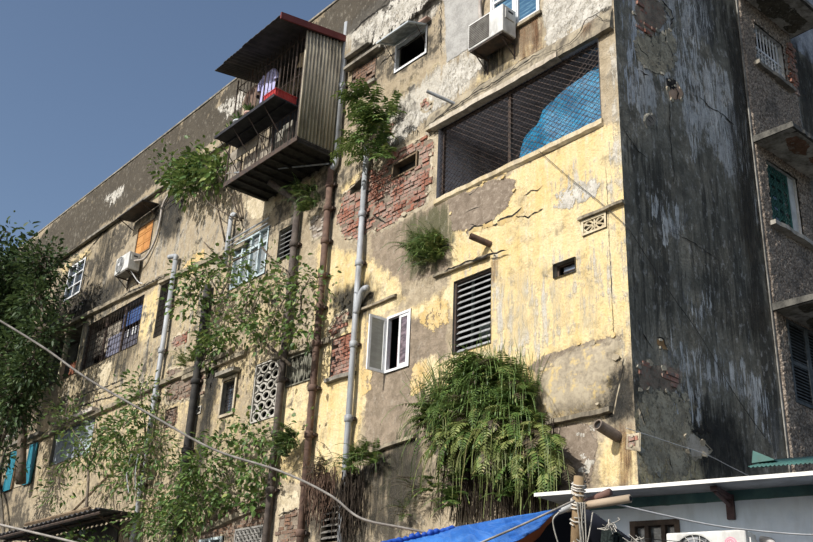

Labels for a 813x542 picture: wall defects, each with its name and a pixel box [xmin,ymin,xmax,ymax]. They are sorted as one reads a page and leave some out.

water stain [617,0,641,104]
peeling [632,0,684,105]
peeling [105,185,124,205]
flaking render [308,0,482,245]
crack [446,172,543,271]
peeling [553,178,601,210]
water stain [649,195,683,247]
water stain [668,0,766,335]
water stain [70,228,129,327]
flaking render [326,309,349,342]
water stain [327,280,377,321]
peeling [626,359,713,484]